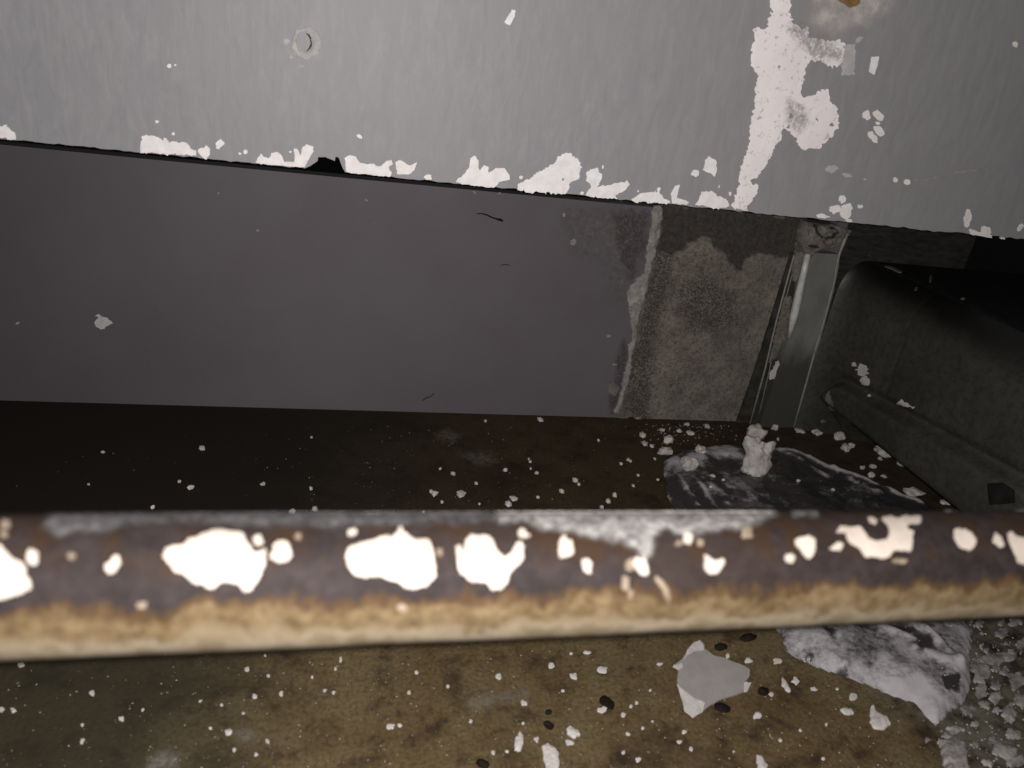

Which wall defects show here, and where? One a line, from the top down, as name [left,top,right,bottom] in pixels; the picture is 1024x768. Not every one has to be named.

peeling [140,132,225,160]
peeling [239,144,313,167]
peeling [344,155,432,180]
spalling [456,0,866,423]
damp [658,203,806,270]
peeling [0,519,39,599]
peeling [163,529,301,591]
peeling [346,526,442,589]
peeling [456,528,530,590]
peeling [784,535,816,563]
peeling [829,515,921,564]
peeling [993,531,1024,564]